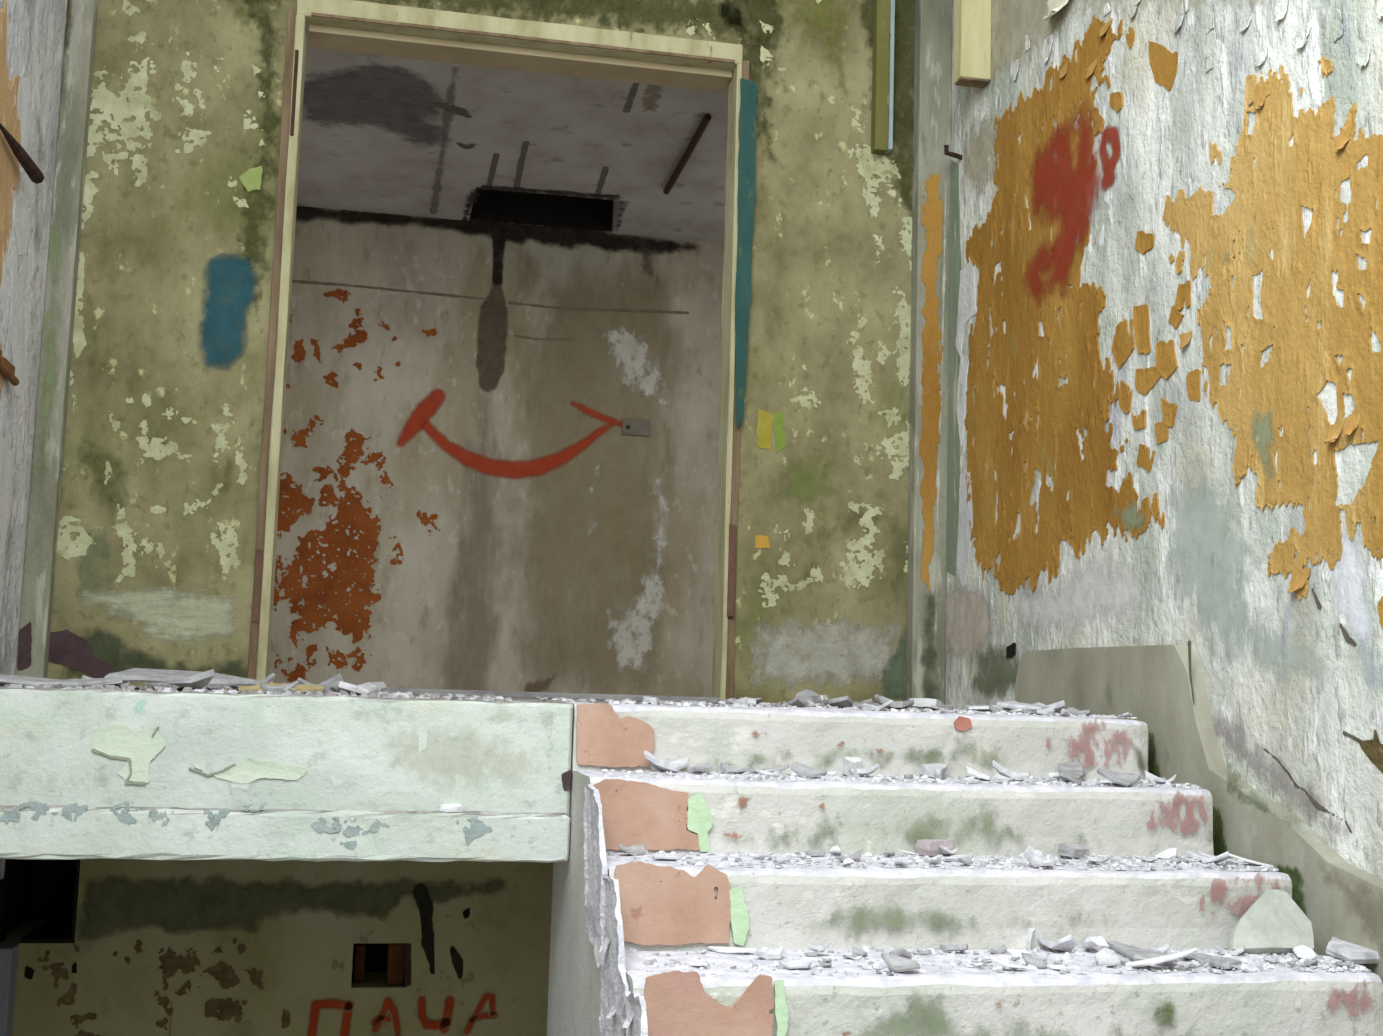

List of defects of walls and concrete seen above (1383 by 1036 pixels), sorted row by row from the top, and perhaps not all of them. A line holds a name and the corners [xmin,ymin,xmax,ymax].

peeling [0,0,34,397]
peeling [81,0,162,230]
peeling [291,288,400,388]
damp [476,221,508,391]
peeling [847,0,1383,663]
peeling [126,393,192,464]
peeling [183,406,248,580]
peeling [256,427,404,695]
peeling [758,501,885,608]
peeling [91,723,165,783]
peeling [561,696,789,1036]
spalling [113,938,264,1030]